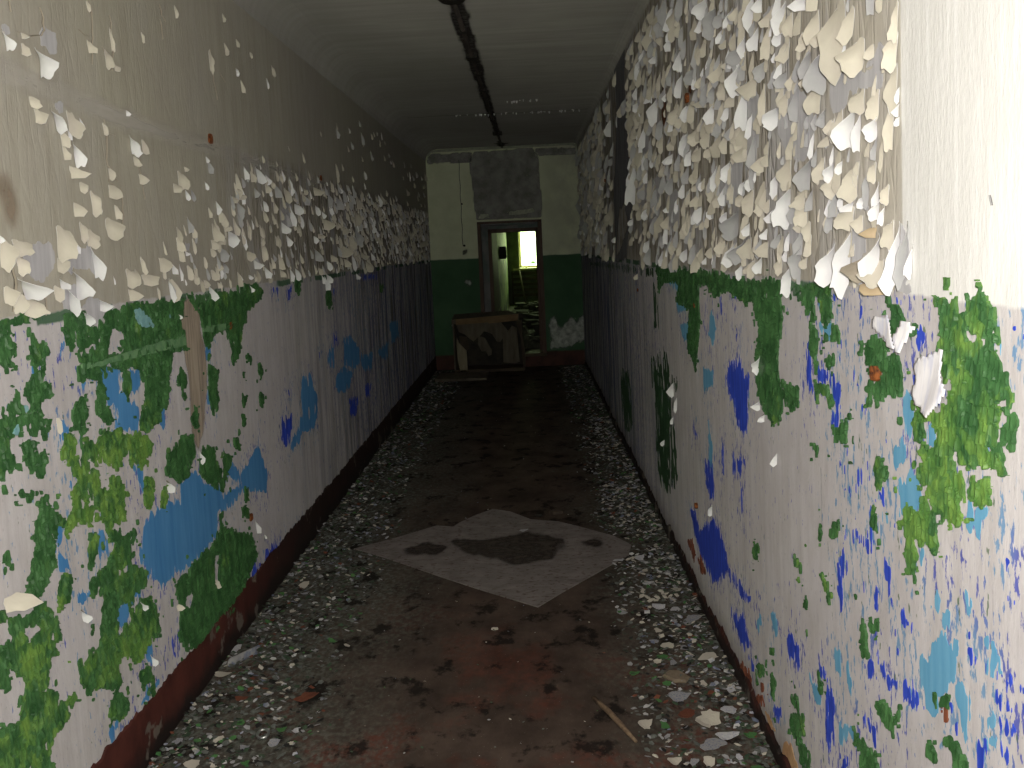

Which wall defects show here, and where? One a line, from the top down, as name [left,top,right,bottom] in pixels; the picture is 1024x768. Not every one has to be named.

peeling [1,24,59,80]
peeling [87,27,121,72]
peeling [209,39,253,75]
peeling [427,0,1024,768]
peeling [0,96,430,768]